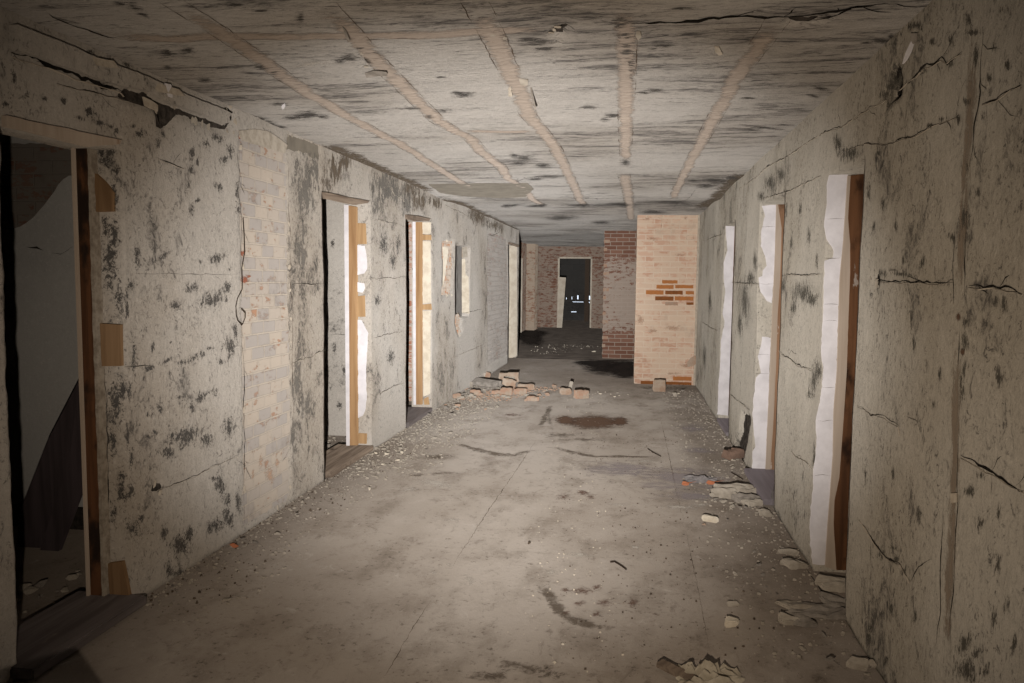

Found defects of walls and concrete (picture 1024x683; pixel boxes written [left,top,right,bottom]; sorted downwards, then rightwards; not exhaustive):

crack [11,52,127,109]
crack [632,4,927,90]
crack [740,26,1022,204]
crack [874,219,1022,315]
crack [156,325,251,492]
leakage [539,409,720,499]
peeling [809,174,848,565]
crack [858,395,923,439]
crack [957,436,1024,493]
crack [858,492,958,649]